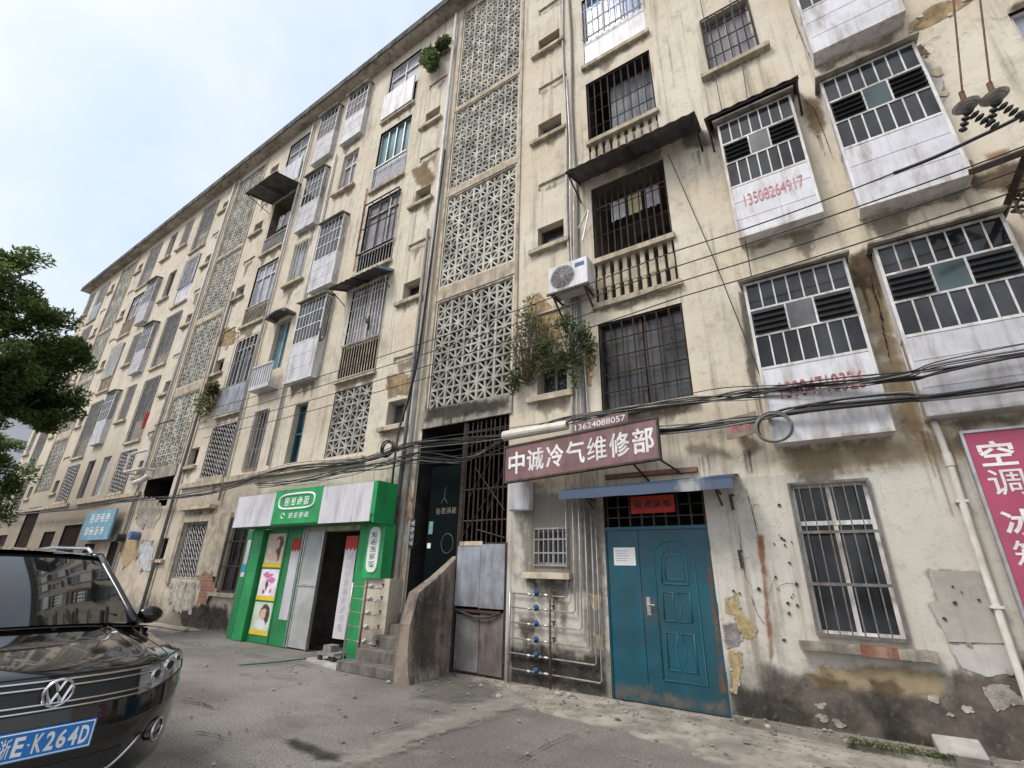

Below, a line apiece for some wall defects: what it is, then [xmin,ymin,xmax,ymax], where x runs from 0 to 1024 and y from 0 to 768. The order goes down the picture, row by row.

flaking render [909,0,972,32]
crack [870,274,892,363]
peeling [120,494,163,573]
peeling [168,570,217,615]
rust [758,535,770,635]
peeling [723,590,757,694]
water stain [733,661,1024,762]
flaking render [983,684,1024,711]